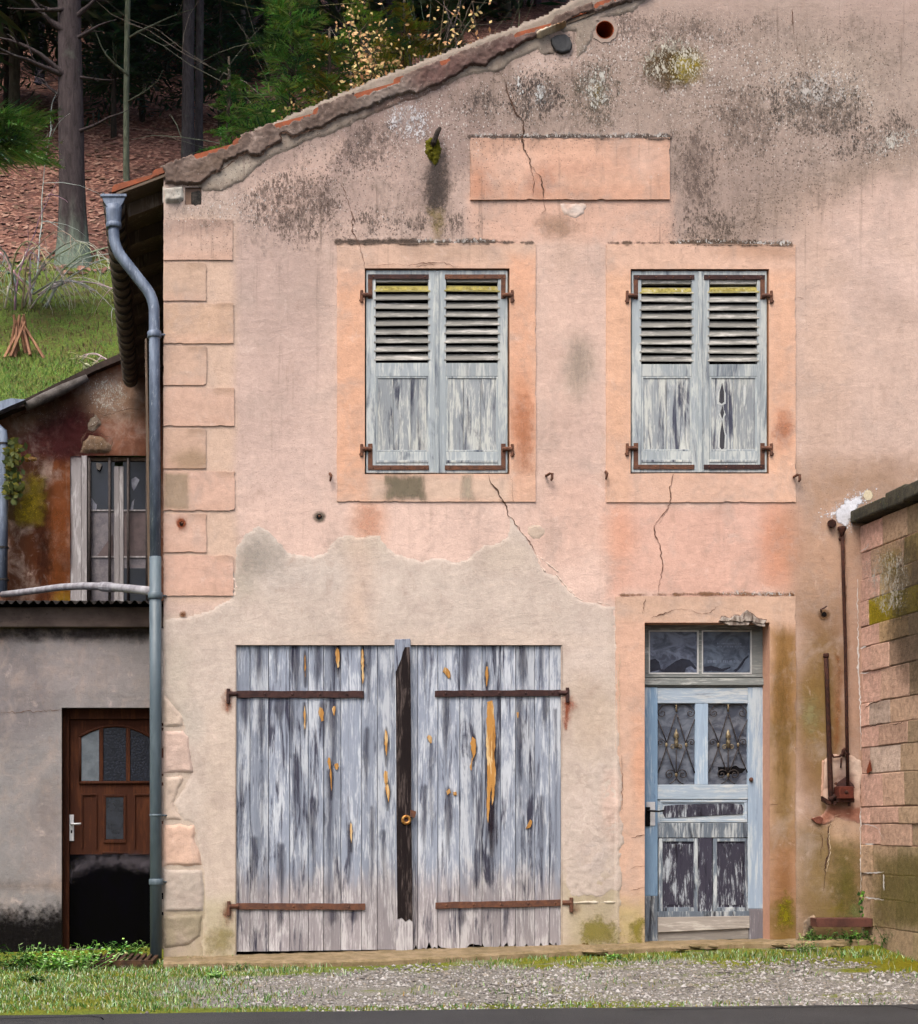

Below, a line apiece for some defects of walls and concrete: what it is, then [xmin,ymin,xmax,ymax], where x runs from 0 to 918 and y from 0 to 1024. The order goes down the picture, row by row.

crack [497,71,546,213]
mould [750,72,912,160]
mould [244,168,341,250]
leakage [335,150,534,245]
mould [609,204,793,247]
crack [488,474,535,552]
crack [643,474,716,618]
leakage [818,488,878,534]
peeling [161,516,624,956]
crack [820,823,831,891]
leakage [0,907,62,952]